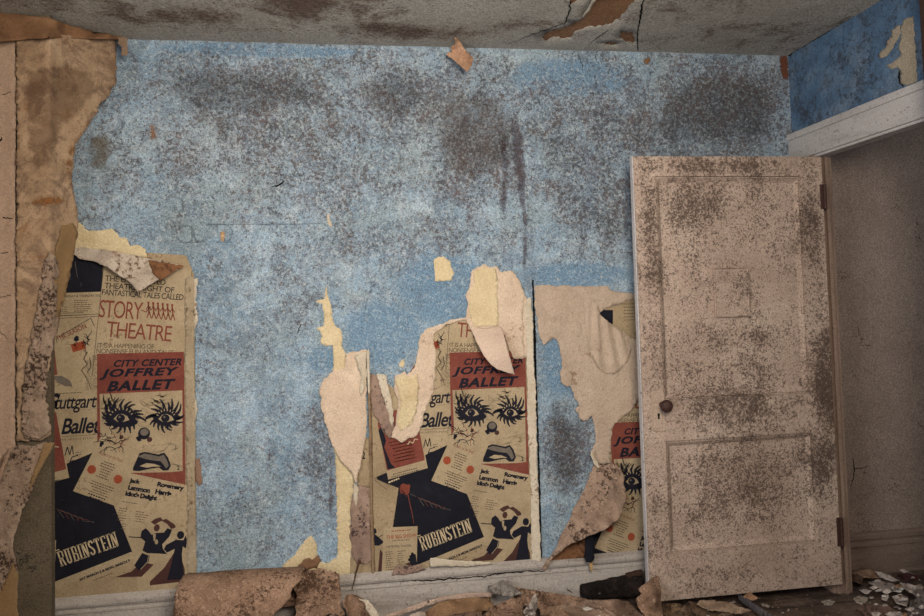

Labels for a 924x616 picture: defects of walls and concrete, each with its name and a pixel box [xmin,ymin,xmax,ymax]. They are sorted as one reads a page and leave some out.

peeling [0,12,128,56]
peeling [446,37,473,72]
spalling [542,0,634,40]
spalling [605,31,635,45]
crack [636,0,644,51]
peeling [878,16,918,85]
water stain [500,116,526,225]
crack [0,46,17,446]
spalling [20,252,60,439]